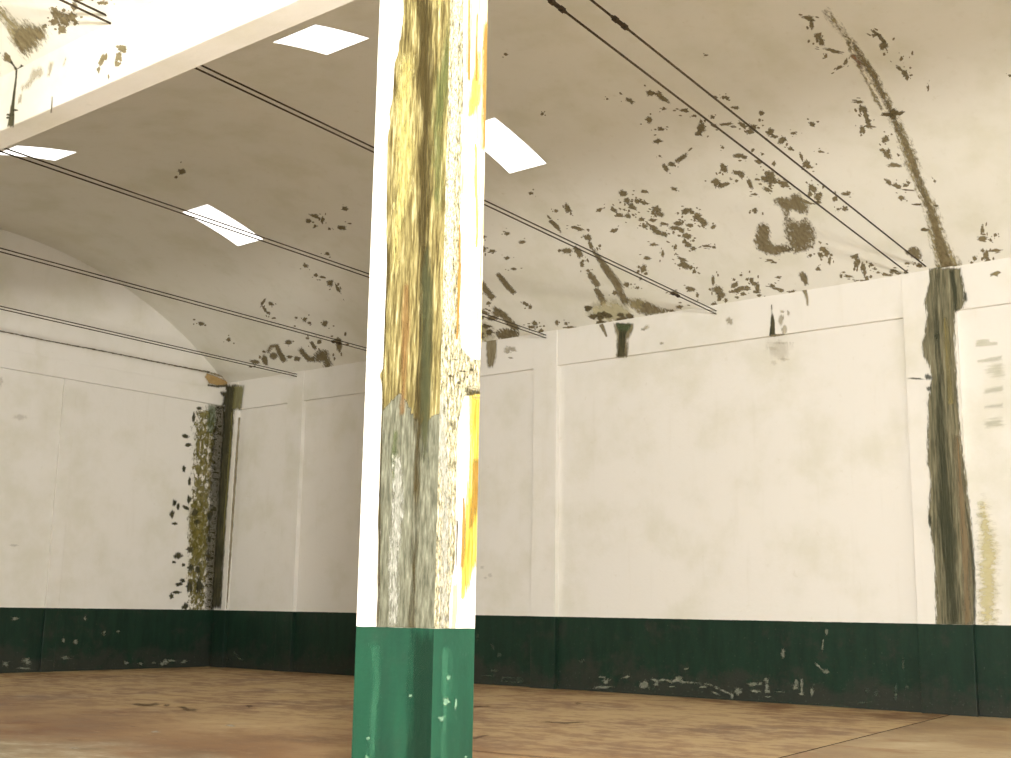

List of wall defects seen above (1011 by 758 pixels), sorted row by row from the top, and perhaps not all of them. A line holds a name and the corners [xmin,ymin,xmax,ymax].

peeling [42,0,108,34]
peeling [97,45,127,80]
peeling [640,85,851,211]
peeling [853,100,911,167]
peeling [482,279,575,332]
leakage [547,216,674,358]
peeling [596,190,716,280]
peeling [670,271,796,312]
peeling [840,253,923,282]
leakage [825,12,995,625]
peeling [970,222,1001,264]
leakage [376,0,519,758]